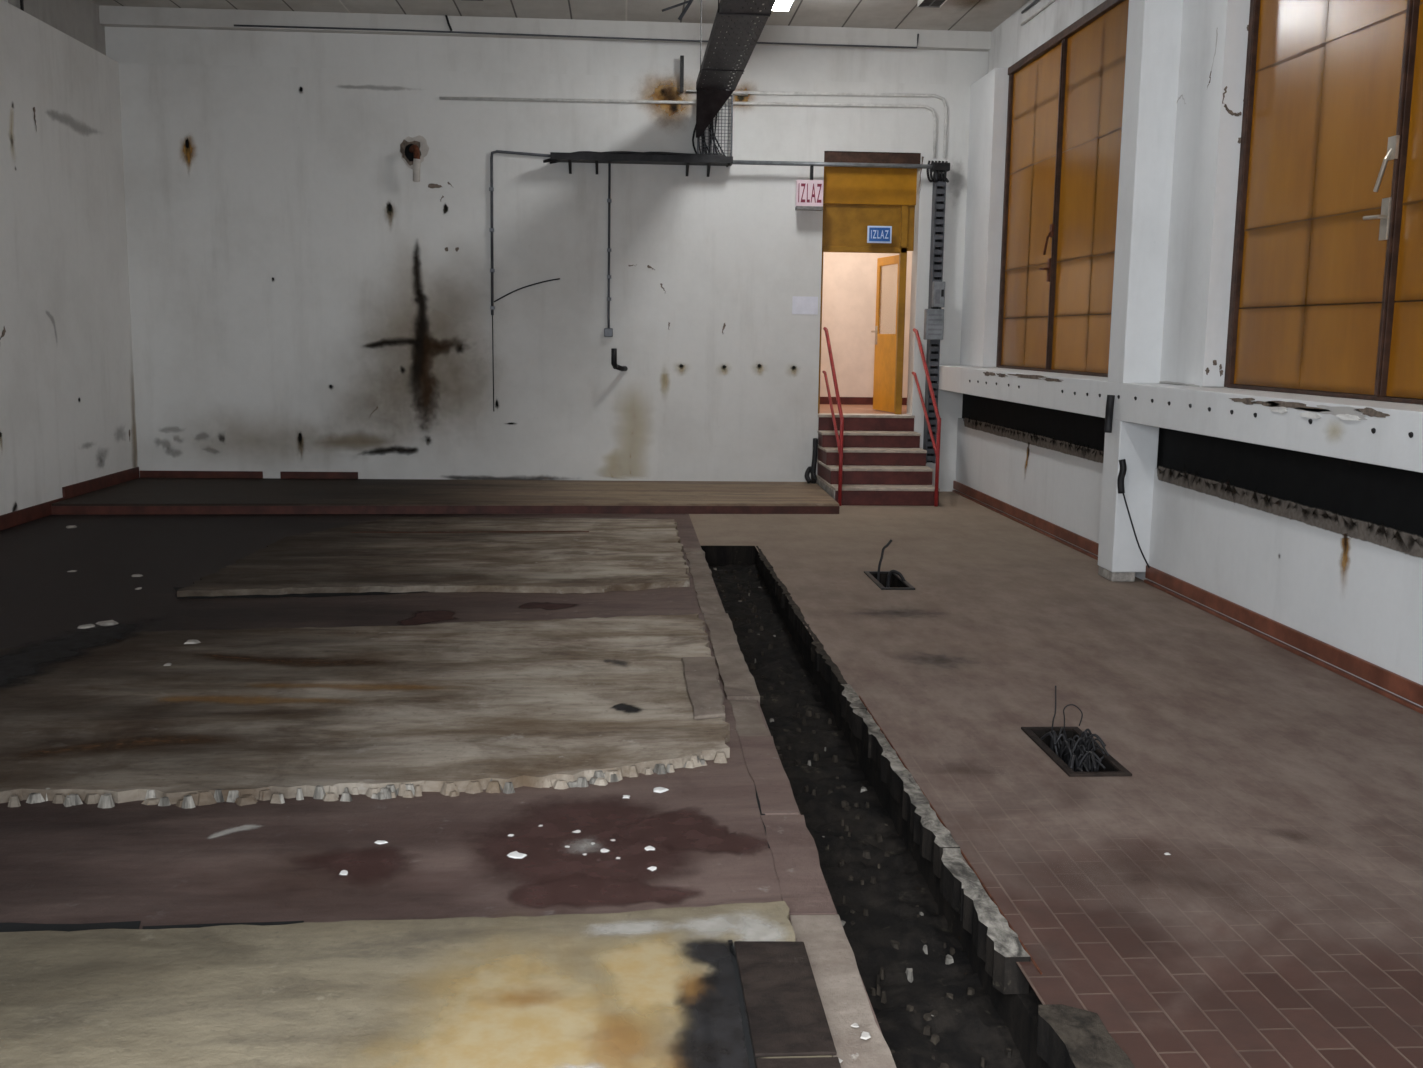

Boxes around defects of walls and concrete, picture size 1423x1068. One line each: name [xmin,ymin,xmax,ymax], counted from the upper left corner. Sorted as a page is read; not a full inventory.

rust [648,81,687,118]
rust [182,138,194,165]
damp [331,246,462,454]
spalling [1229,398,1390,421]
rust [1341,534,1349,574]
damp [604,924,656,933]
damp [691,918,778,941]